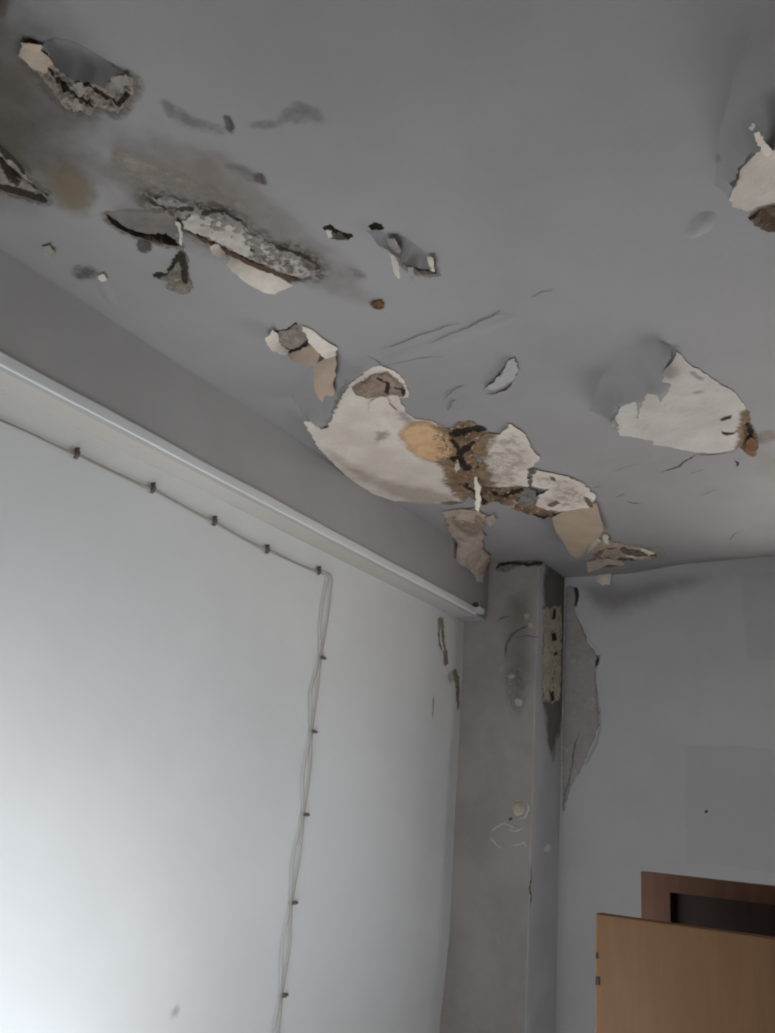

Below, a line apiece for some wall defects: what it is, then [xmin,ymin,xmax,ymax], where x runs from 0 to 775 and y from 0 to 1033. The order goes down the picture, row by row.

spalling [19,37,140,116]
peeling [715,0,775,232]
spalling [0,142,50,204]
spalling [105,191,321,294]
spalling [322,224,354,241]
peeling [367,222,439,281]
peeling [590,341,759,457]
peeling [265,322,661,585]
spalling [541,586,600,814]